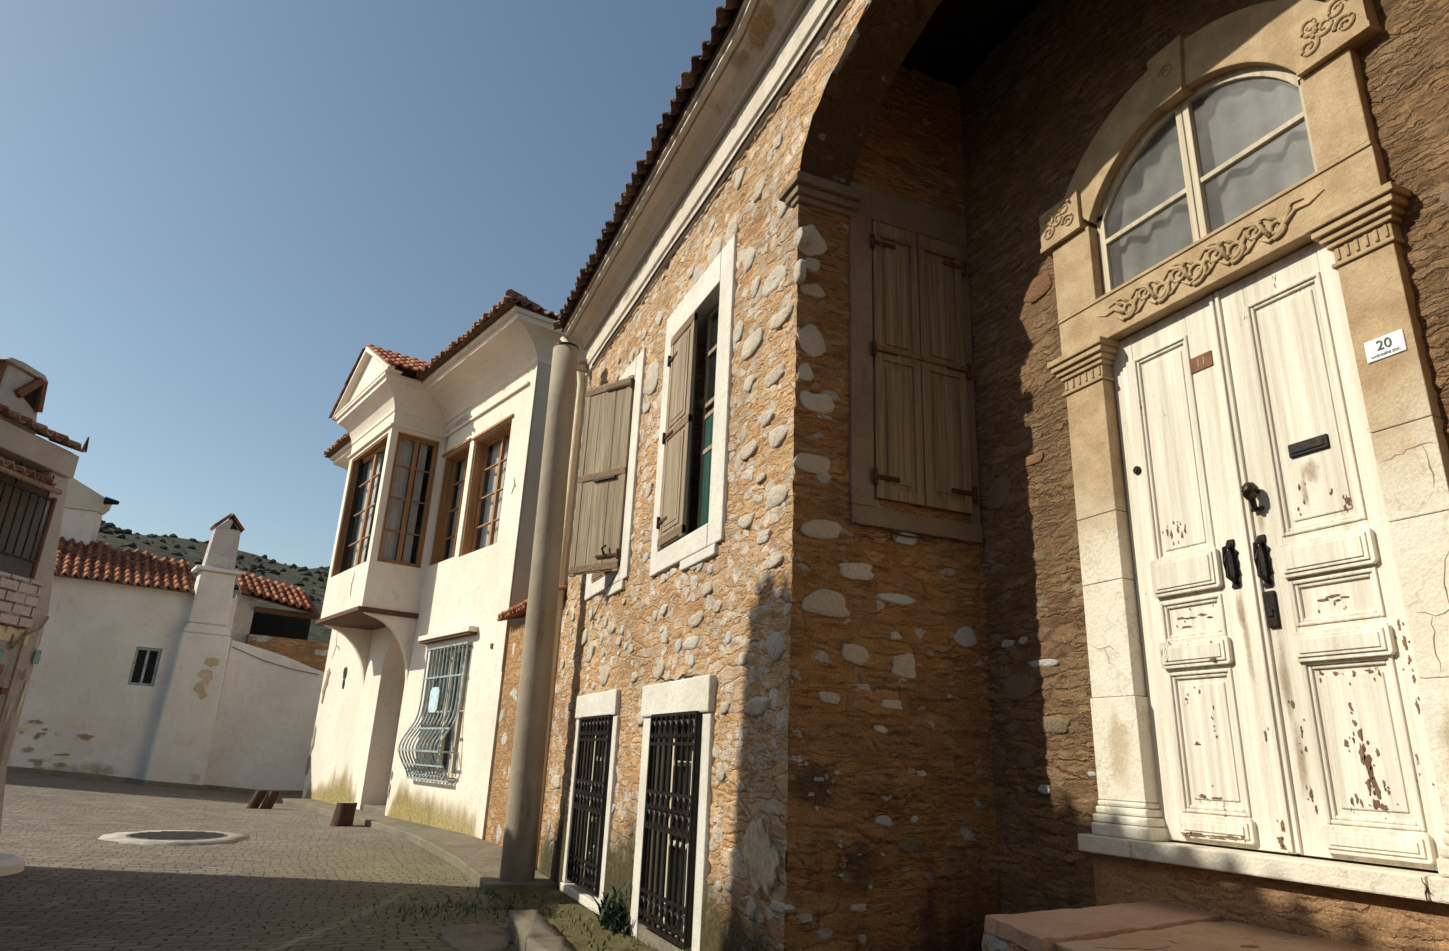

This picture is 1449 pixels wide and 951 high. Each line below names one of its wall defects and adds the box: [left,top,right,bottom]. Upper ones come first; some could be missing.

crack [1383,442,1434,483]
peeling [1317,594,1349,613]
crack [1420,552,1449,670]
peeling [1395,619,1420,714]
peeling [1344,702,1398,819]
peeling [1181,825,1245,848]
peeling [1276,819,1290,855]